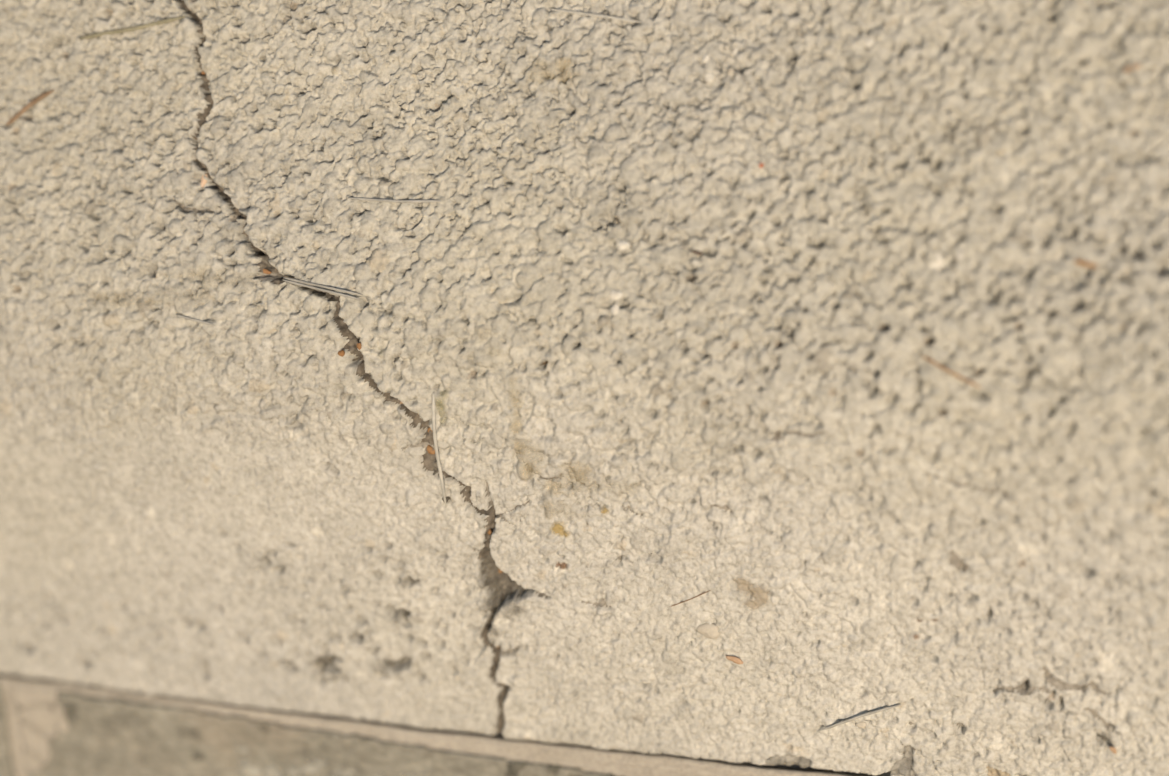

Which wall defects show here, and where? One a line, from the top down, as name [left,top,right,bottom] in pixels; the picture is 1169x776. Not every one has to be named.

crack [174,0,562,733]
crack [579,599,611,608]